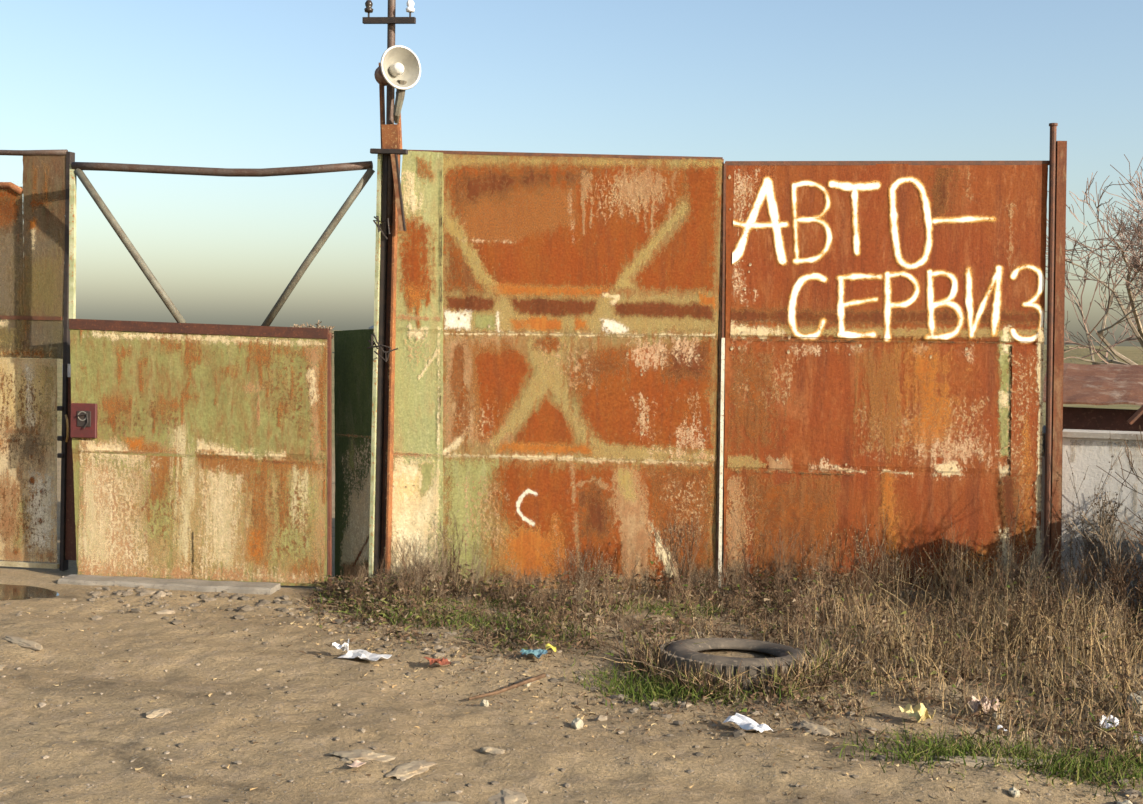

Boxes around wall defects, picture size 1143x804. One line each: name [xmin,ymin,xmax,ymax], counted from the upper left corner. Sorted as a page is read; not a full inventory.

peeling [443,157,634,173]
peeling [681,159,760,222]
corrosion [931,168,969,219]
corrosion [385,157,748,591]
corrosion [731,307,1044,447]
corrosion [880,467,899,591]